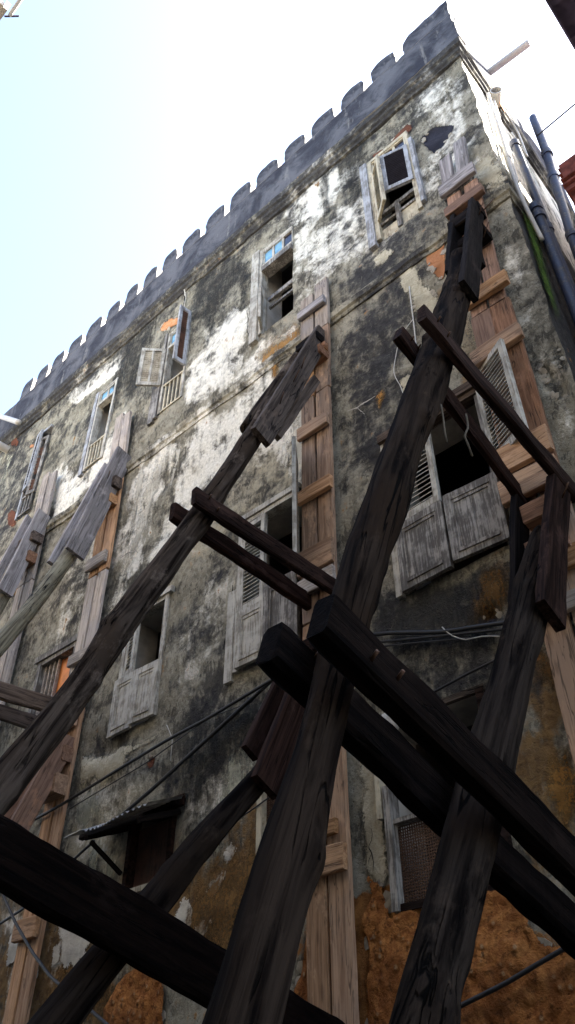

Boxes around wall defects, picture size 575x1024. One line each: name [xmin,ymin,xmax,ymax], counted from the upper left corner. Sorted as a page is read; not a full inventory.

spalling [373,123,454,157]
damp [320,141,366,230]
spalling [161,315,178,332]
damp [192,255,248,342]
peeling [399,244,446,314]
damp [284,411,302,482]
damp [187,678,268,818]
spalling [358,762,420,1024]
spalling [103,969,166,1024]
spalling [461,890,575,1024]